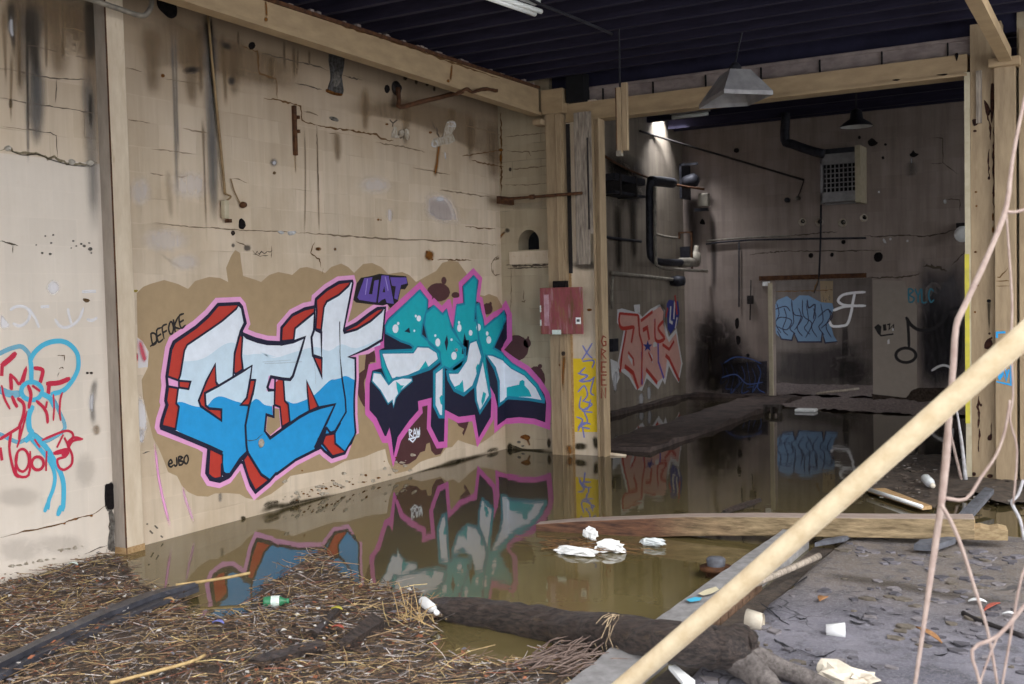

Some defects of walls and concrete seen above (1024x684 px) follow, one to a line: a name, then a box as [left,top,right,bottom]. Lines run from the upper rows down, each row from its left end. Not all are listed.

crack [0,25,97,157]
damp [4,0,95,197]
damp [172,21,298,208]
crack [238,35,545,197]
damp [364,97,478,146]
crack [1,507,103,538]